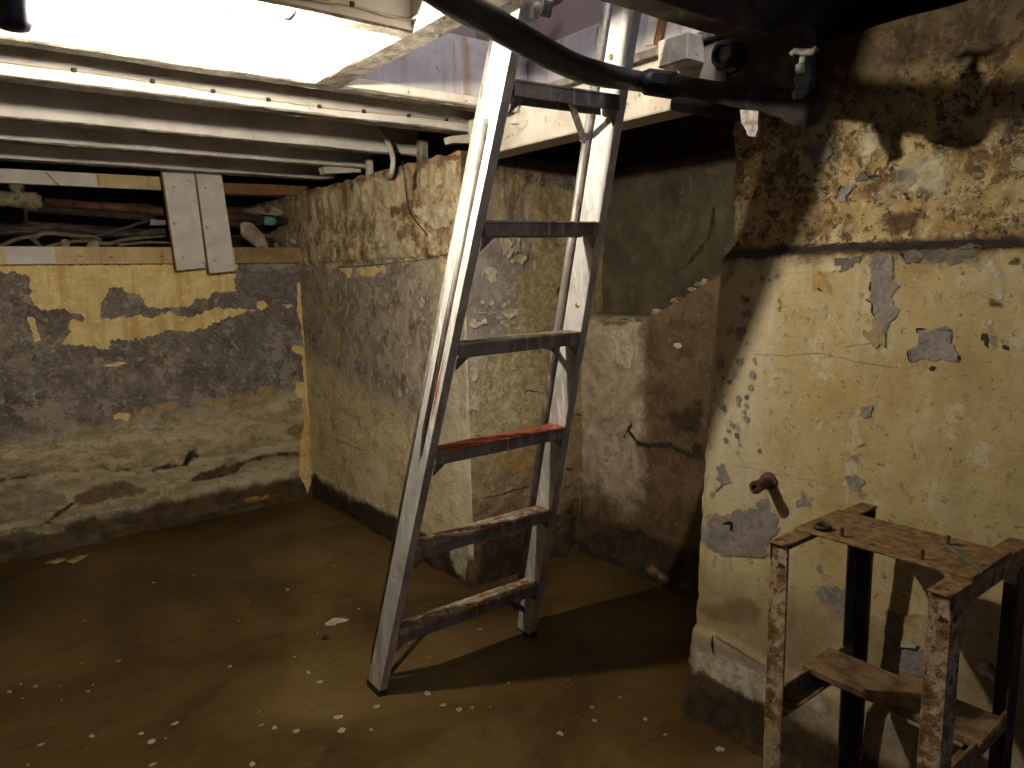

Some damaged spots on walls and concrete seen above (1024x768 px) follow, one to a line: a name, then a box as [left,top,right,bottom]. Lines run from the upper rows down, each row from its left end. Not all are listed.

peeling [835,171,881,203]
peeling [0,264,267,357]
peeling [825,243,980,349]
peeling [907,326,960,371]
peeling [97,401,179,421]
peeling [282,282,312,493]
damp [152,450,199,472]
damp [192,452,298,482]
crack [624,421,705,460]
peeling [844,443,865,499]
damp [0,469,145,535]
peeling [701,497,779,559]